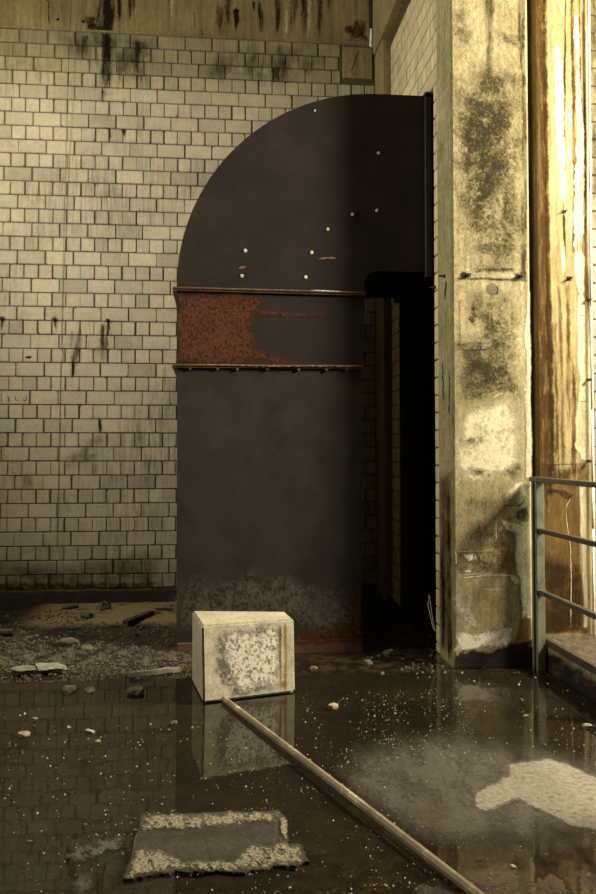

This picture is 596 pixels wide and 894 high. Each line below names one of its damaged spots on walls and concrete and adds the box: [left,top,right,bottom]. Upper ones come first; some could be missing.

leakage [82,0,135,93]
leakage [217,0,239,29]
leakage [275,0,330,36]
leakage [458,20,532,478]
rust [177,292,323,364]
rust [534,0,587,634]